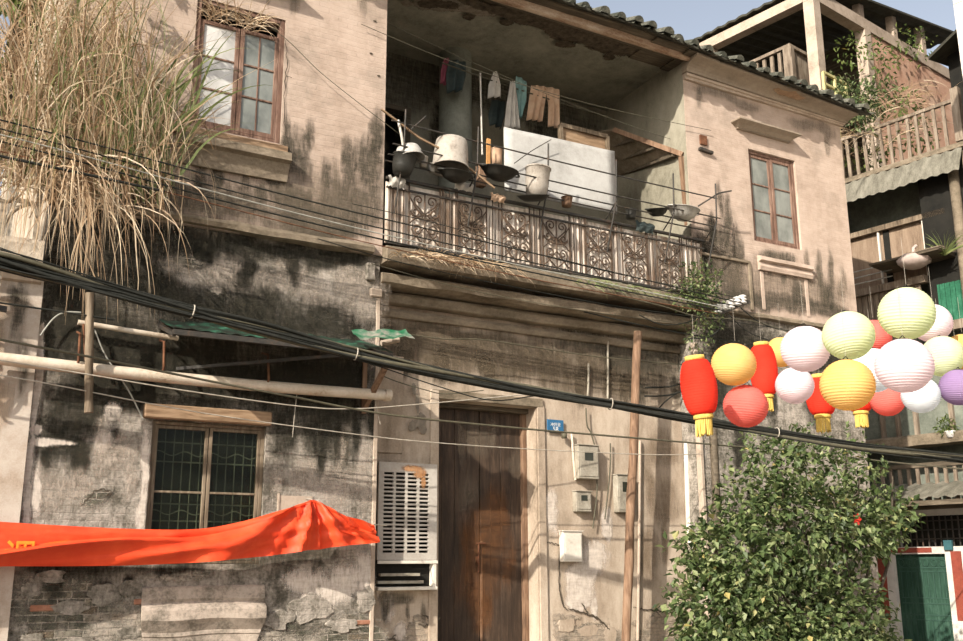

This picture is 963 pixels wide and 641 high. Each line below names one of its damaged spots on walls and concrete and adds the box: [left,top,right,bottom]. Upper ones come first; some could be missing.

peeling [401,0,640,60]
damp [385,52,439,143]
damp [522,94,602,139]
damp [41,113,680,402]
damp [693,191,846,317]
damp [18,281,374,529]
rust [404,465,426,488]
spalling [10,570,143,641]
spalling [257,586,388,641]
crack [547,542,610,630]
spalling [553,598,621,641]
spalling [632,612,684,641]